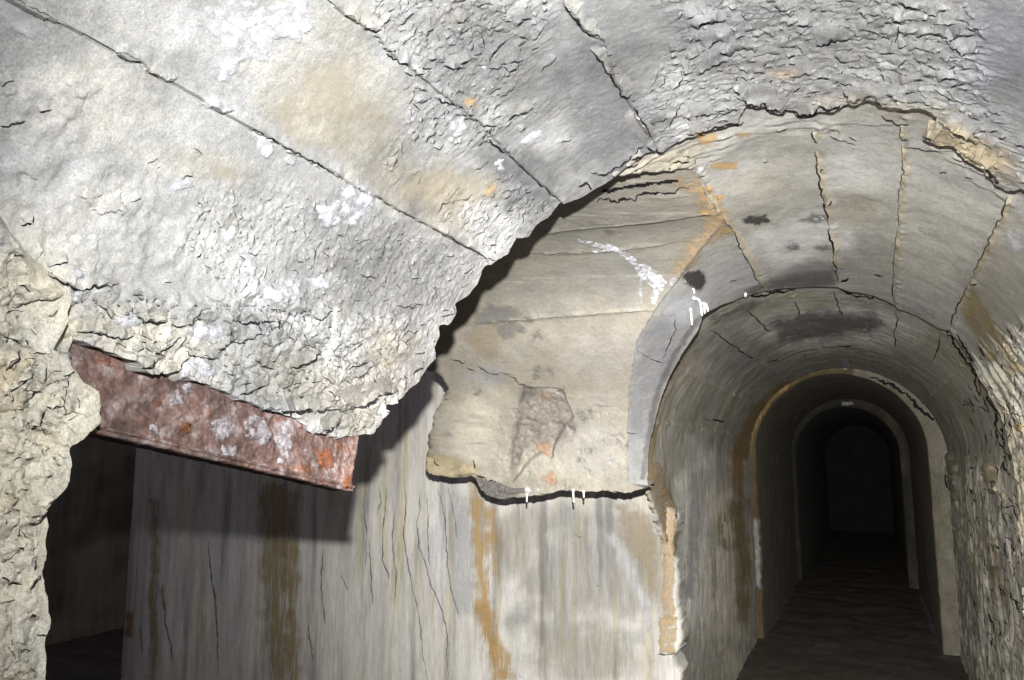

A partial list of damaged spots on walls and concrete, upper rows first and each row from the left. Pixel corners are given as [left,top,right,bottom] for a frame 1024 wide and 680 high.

spalling [75,0,556,416]
crack [201,95,499,261]
crack [344,5,412,66]
leakage [578,230,835,320]
crack [454,0,1012,454]
leakage [743,215,770,225]
leakage [771,310,882,342]
spalling [642,0,1024,185]
spalling [0,275,90,604]
rust [301,443,343,473]
rust [472,496,510,680]
spalling [952,323,1024,673]